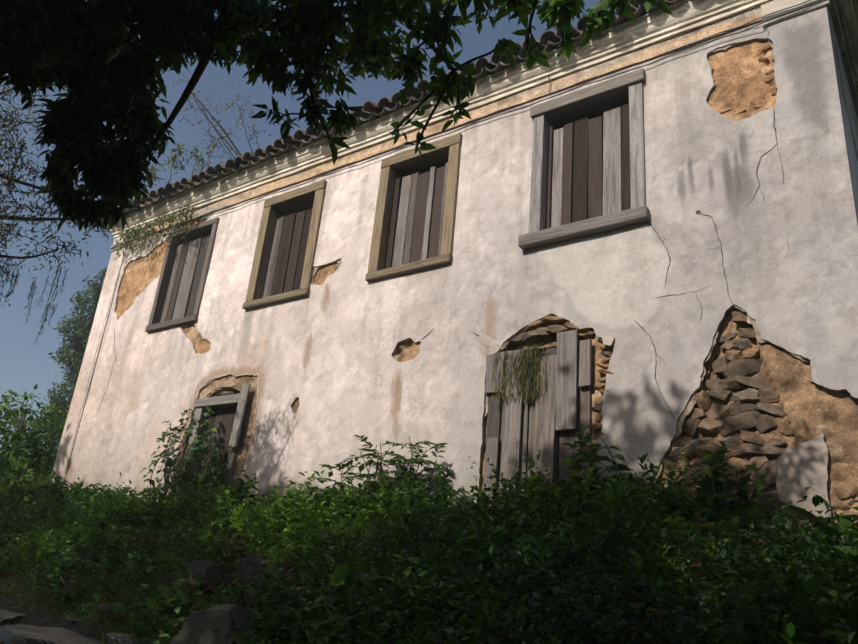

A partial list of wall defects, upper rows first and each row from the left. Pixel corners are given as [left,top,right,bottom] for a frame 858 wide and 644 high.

spalling [707,40,777,121]
crack [745,109,784,208]
spalling [115,236,169,320]
spalling [311,259,342,285]
crack [648,213,733,322]
spalling [180,323,211,354]
spalling [183,374,258,494]
spalling [393,339,421,362]
spalling [481,393,489,491]
spalling [498,314,615,475]
crack [635,321,675,420]
spalling [649,305,858,539]